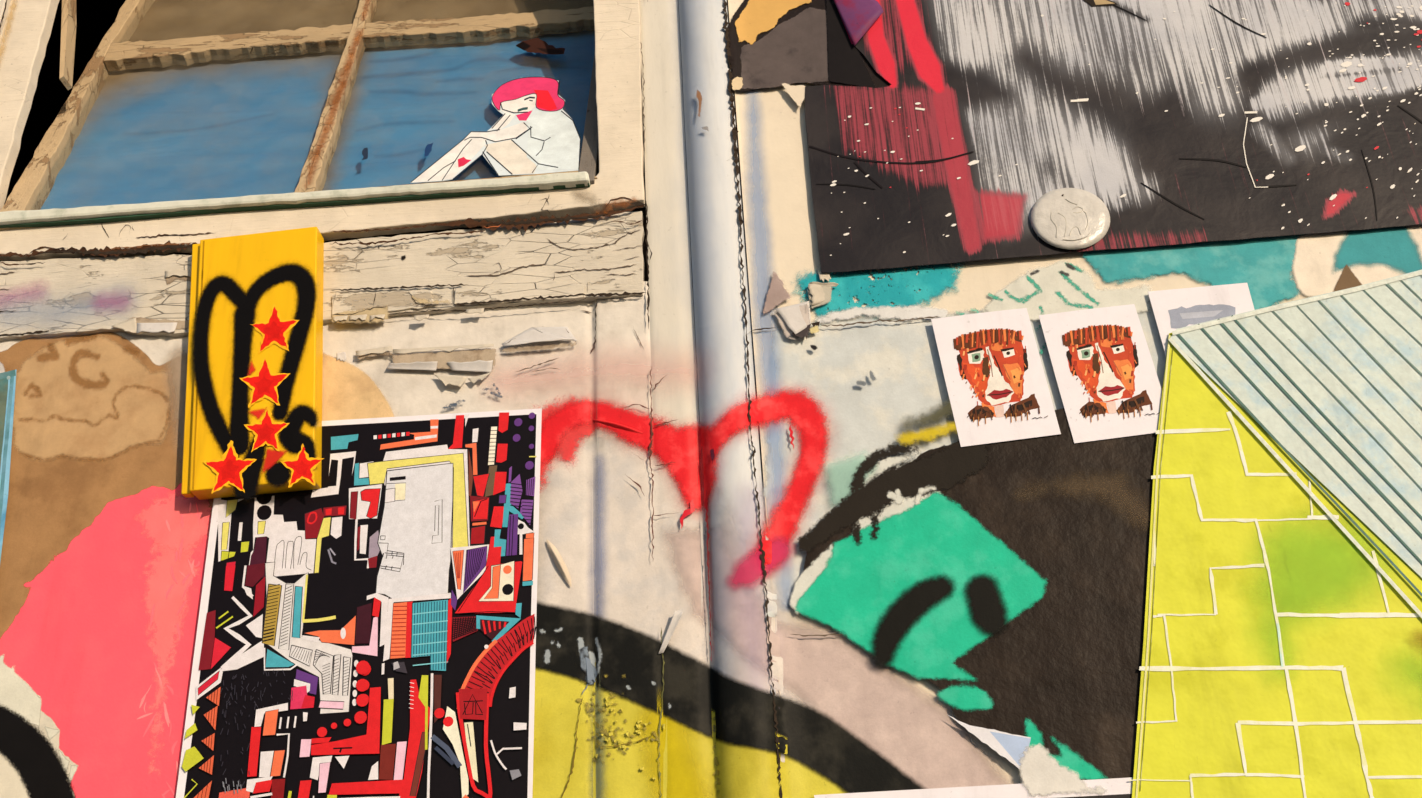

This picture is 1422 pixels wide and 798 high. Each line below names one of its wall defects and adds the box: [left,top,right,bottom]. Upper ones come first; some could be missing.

rust [309,0,369,183]
peeling [164,270,191,285]
peeling [112,317,189,334]
peeling [332,305,388,324]
peeling [412,296,449,321]
peeling [336,327,577,409]